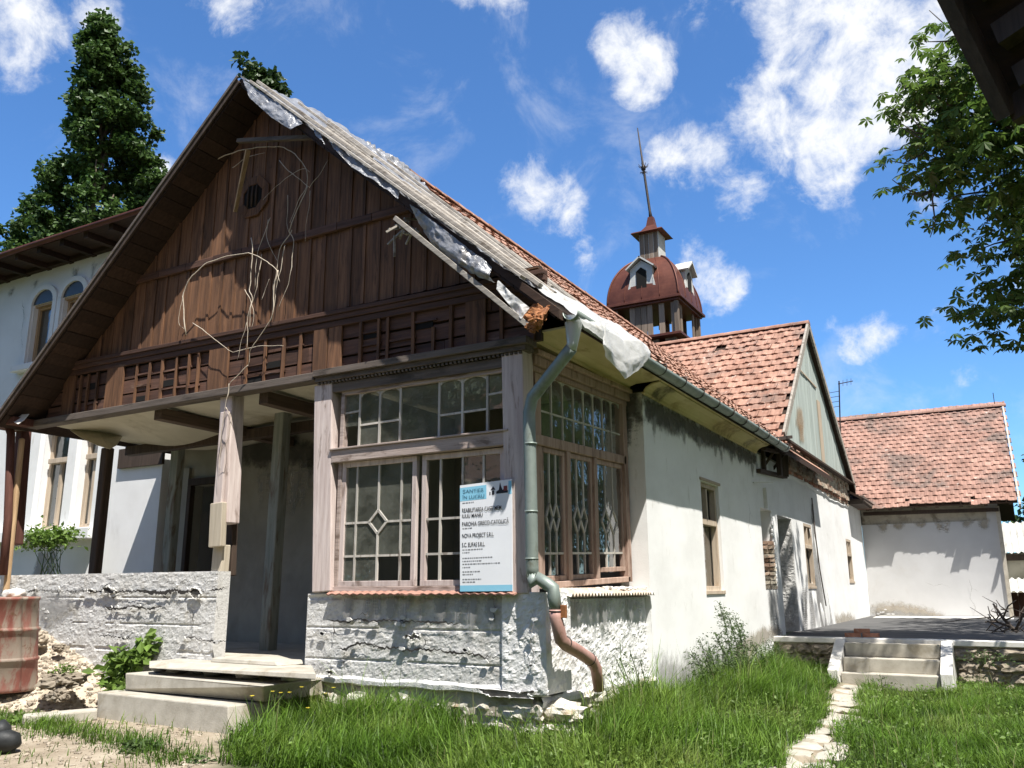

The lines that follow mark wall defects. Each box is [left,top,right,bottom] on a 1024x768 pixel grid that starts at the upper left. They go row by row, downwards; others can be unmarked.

damp [626,387,757,473]
crack [12,583,226,645]
flaking render [189,587,202,600]
crack [312,599,501,669]
flaking render [473,687,538,699]